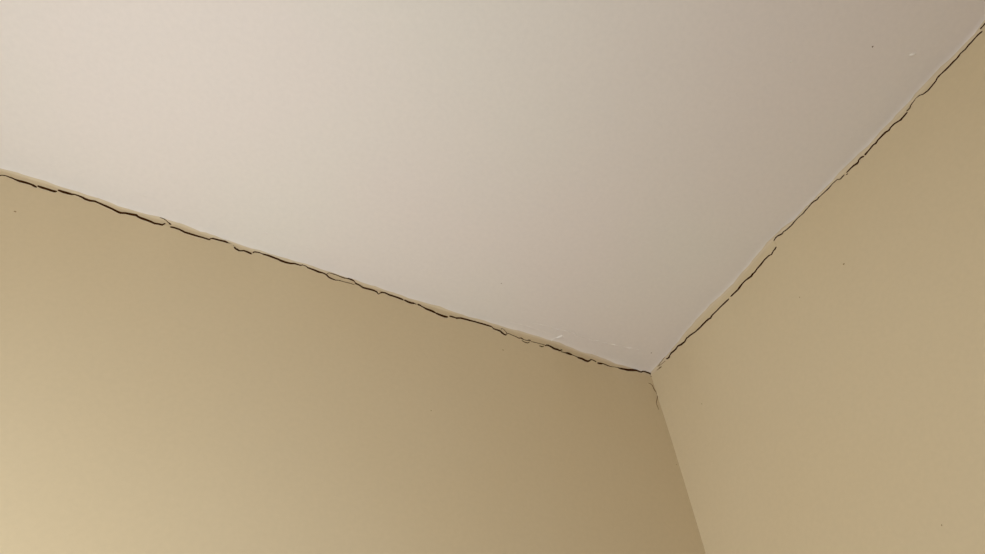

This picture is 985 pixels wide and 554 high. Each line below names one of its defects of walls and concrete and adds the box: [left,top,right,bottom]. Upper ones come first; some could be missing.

crack [0,23,985,410]